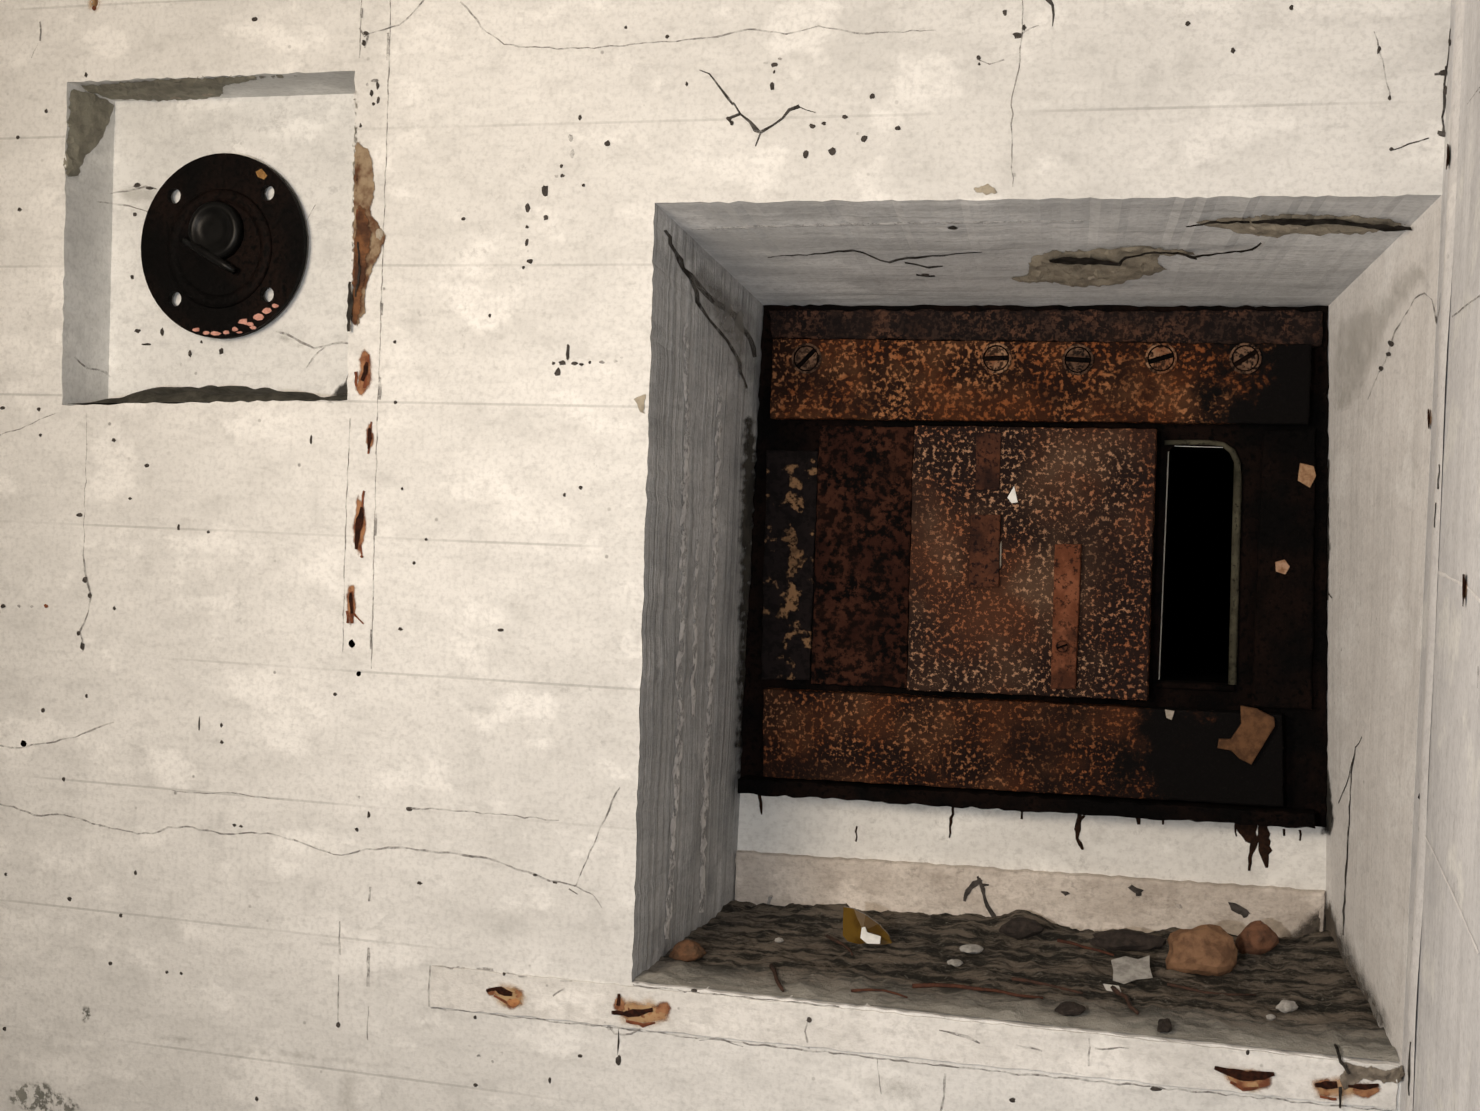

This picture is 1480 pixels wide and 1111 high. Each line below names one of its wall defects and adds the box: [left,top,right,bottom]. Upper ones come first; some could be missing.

crack [469,10,929,146]
crack [976,0,1055,182]
spalling [1012,214,1412,287]
rust [354,350,371,395]
rust [1298,463,1316,488]
rust [353,491,366,558]
rust [1275,560,1290,574]
rust [346,585,364,624]
crack [13,789,619,897]
spalling [1334,1044,1405,1108]